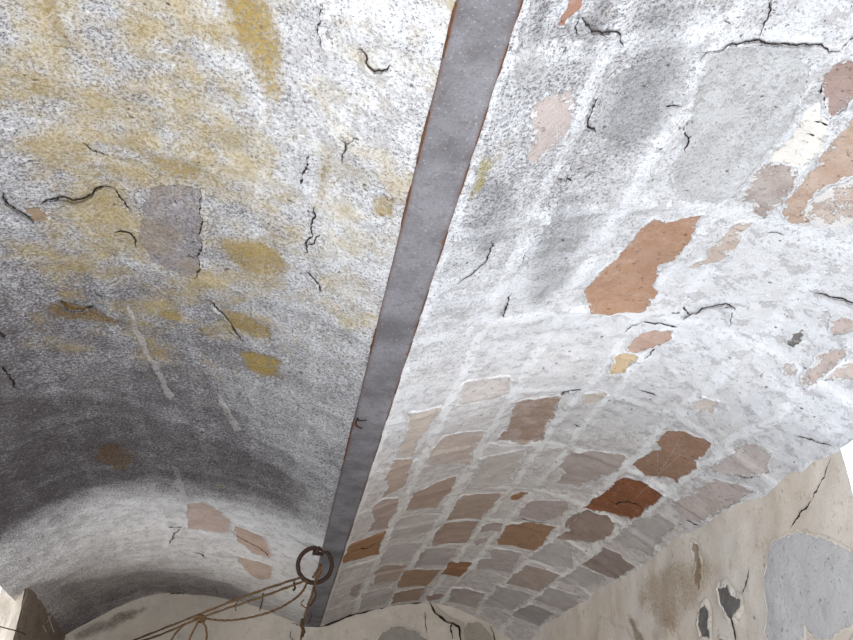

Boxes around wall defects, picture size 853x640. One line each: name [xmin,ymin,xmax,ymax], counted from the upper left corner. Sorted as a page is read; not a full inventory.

water stain [223,0,281,101]
crack [573,17,624,50]
crack [700,0,853,64]
crack [0,186,129,224]
peeling [581,45,853,317]
crack [815,293,853,310]
water stain [241,352,281,376]
flaking render [606,328,675,375]
flaking render [776,314,853,389]
flaking render [184,501,275,581]
flaking render [340,394,775,640]
crack [790,436,833,529]